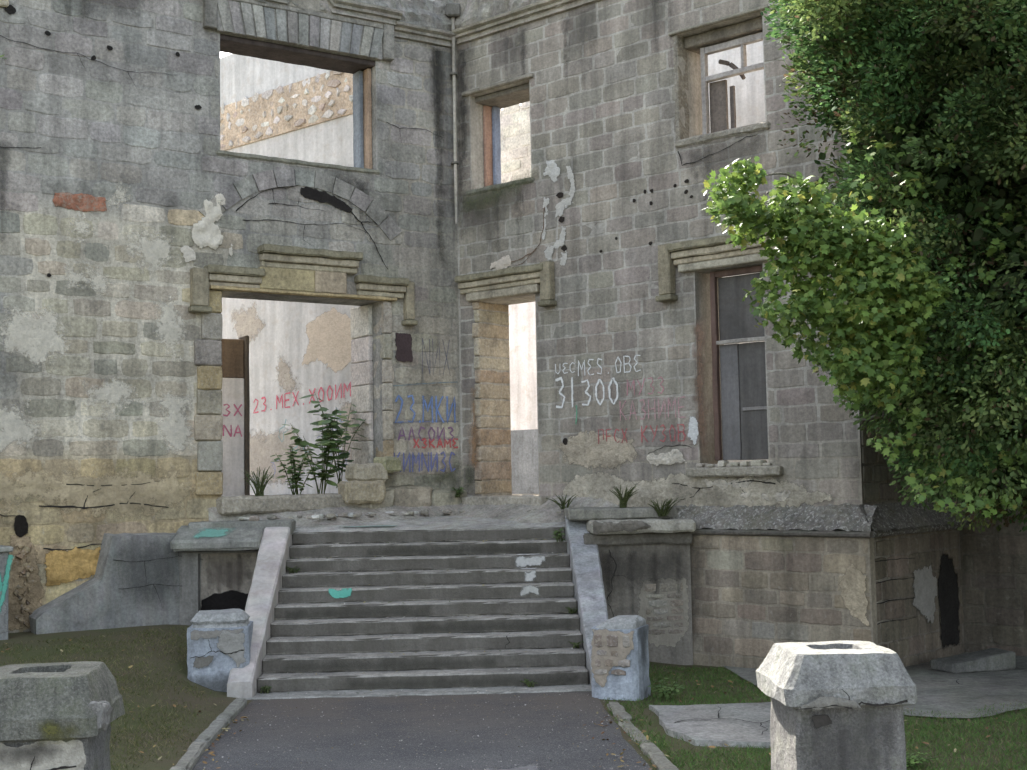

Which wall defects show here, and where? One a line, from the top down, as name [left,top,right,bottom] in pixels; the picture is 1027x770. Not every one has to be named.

peeling [126,193,233,273]
crack [236,185,388,269]
peeling [542,160,576,266]
peeling [276,307,354,393]
crack [0,481,169,517]
peeling [688,416,699,445]
spalling [558,430,832,508]
peeling [191,629,246,668]
peeling [591,629,634,687]
peeling [637,577,690,647]
spalling [912,554,960,648]
crack [30,757,76,770]